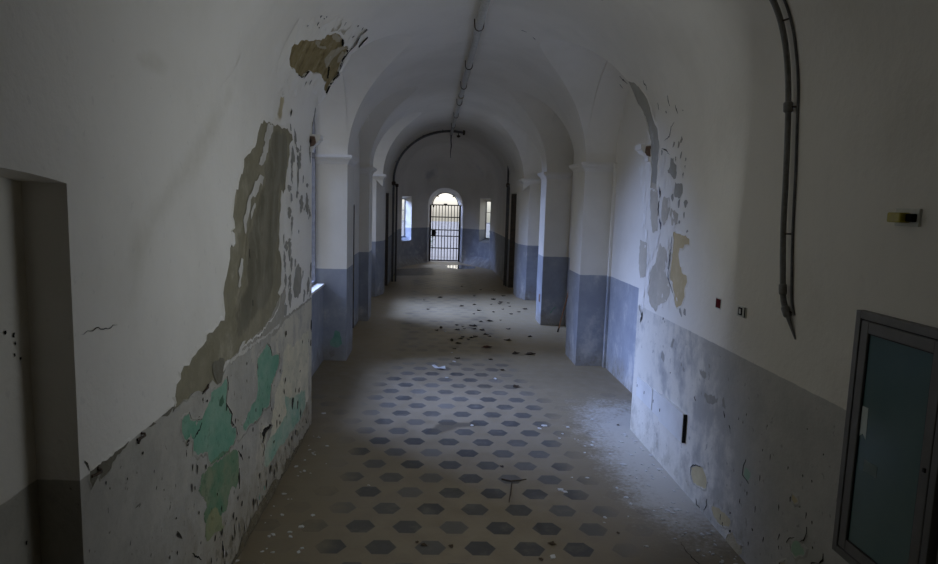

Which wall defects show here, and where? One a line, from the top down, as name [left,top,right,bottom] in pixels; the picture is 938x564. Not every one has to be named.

flaking render [277,14,368,104]
peeling [620,78,691,323]
peeling [149,111,311,564]